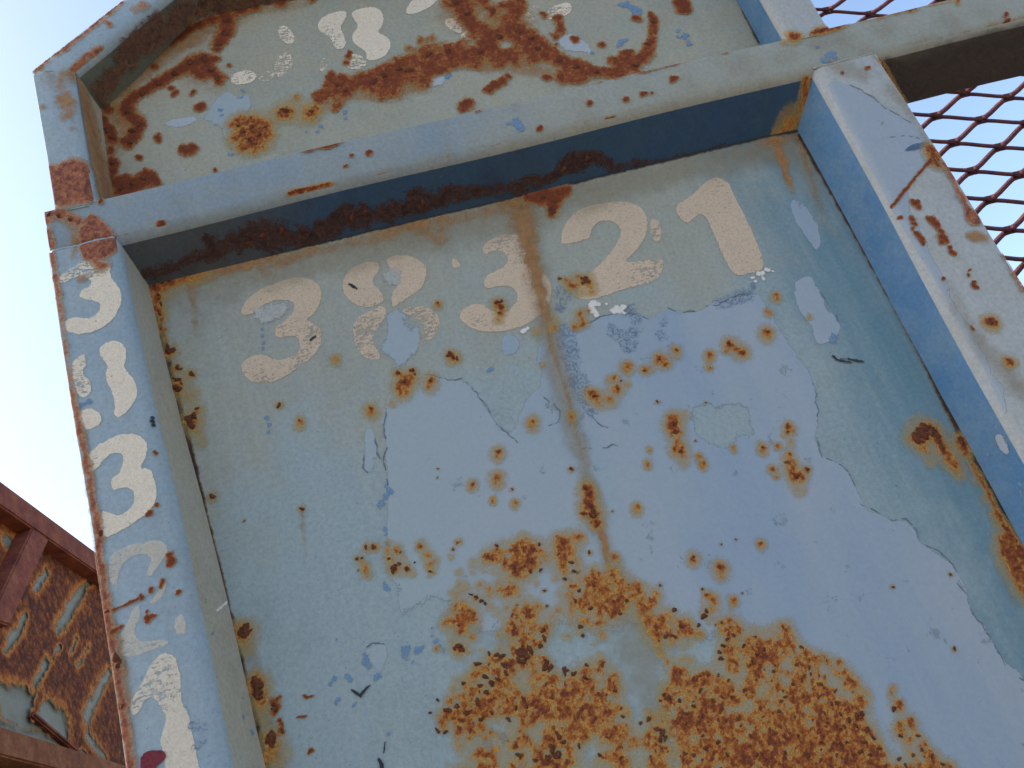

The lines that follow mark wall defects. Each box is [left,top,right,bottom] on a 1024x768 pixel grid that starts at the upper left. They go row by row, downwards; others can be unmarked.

rust [0,0,293,768]
rust [226,0,687,155]
rust [138,75,1024,768]
peeling [362,267,1024,768]